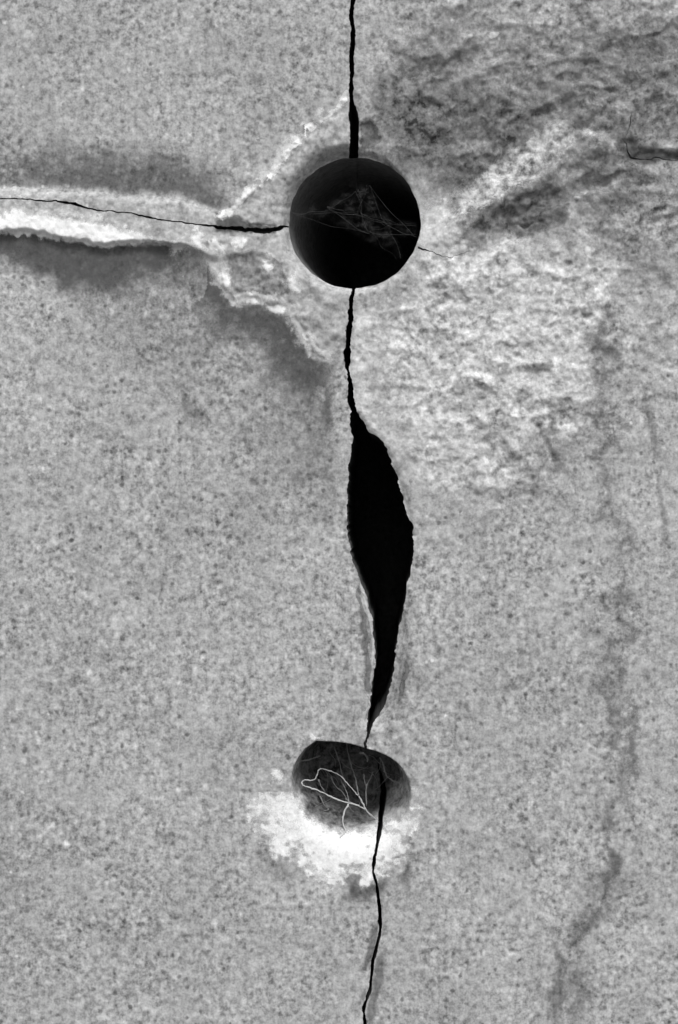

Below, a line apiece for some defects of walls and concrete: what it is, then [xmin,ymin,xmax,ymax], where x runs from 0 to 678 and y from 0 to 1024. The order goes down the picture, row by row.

crack [0,198,288,234]
leakage [0,187,333,388]
crack [348,0,359,186]
spalling [349,19,678,505]
crack [622,112,678,163]
crack [343,291,414,1024]
leakage [246,768,423,897]
spalling [296,741,403,825]